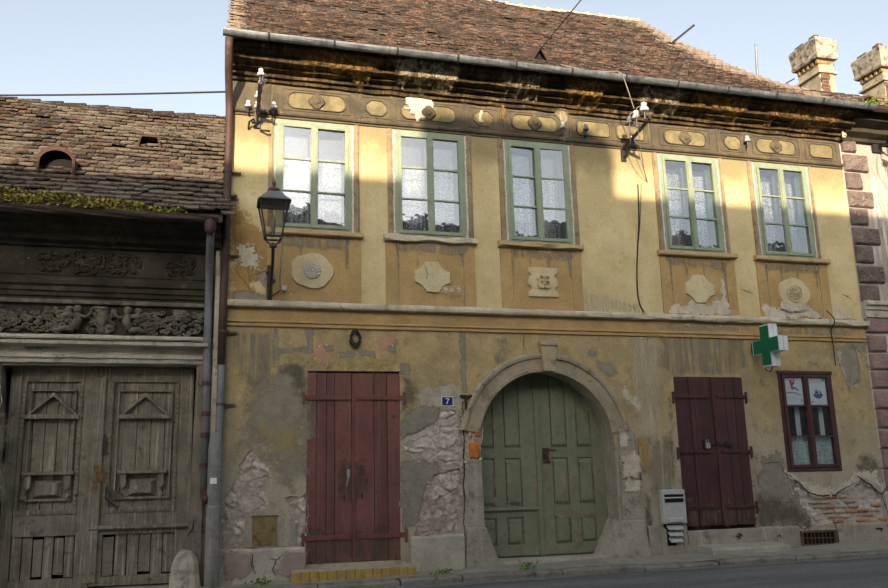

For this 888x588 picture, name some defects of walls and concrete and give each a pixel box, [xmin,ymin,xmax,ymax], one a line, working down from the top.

peeling [404,95,434,121]
peeling [659,279,749,331]
peeling [762,301,855,336]
flaking render [221,449,271,581]
flaking render [276,493,309,577]
flaking render [402,382,483,536]
peeling [619,431,642,493]
flaking render [752,450,888,526]